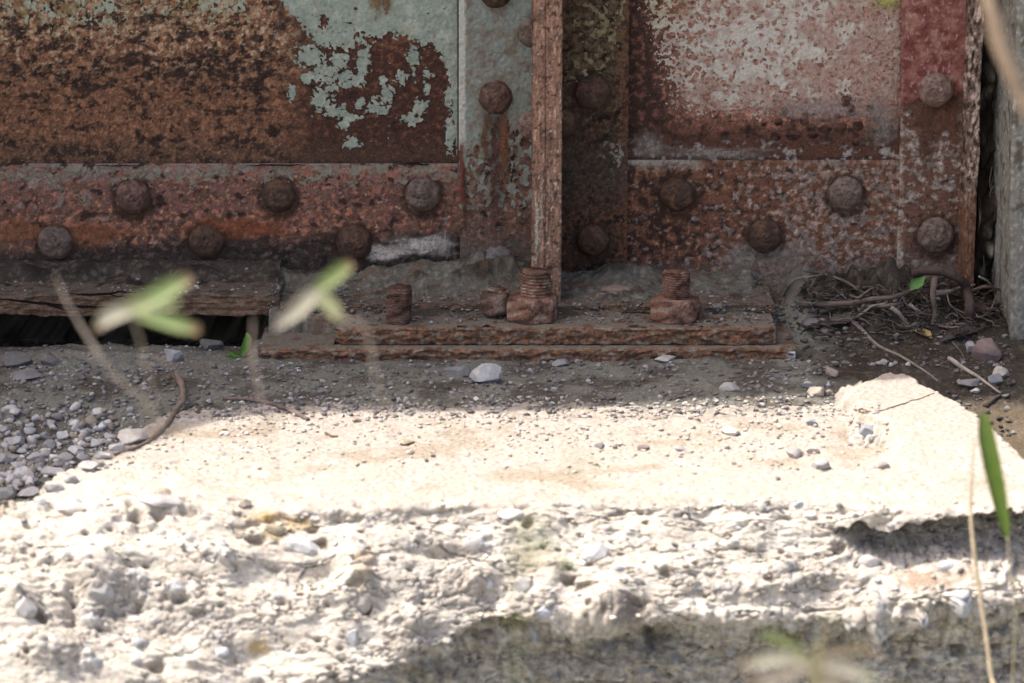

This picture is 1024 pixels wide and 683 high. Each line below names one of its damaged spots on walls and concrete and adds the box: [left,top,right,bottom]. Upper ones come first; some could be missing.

rust [369,0,390,19]
peeling [0,0,532,225]
rust [761,95,893,147]
rust [481,113,509,204]
rust [535,179,544,252]